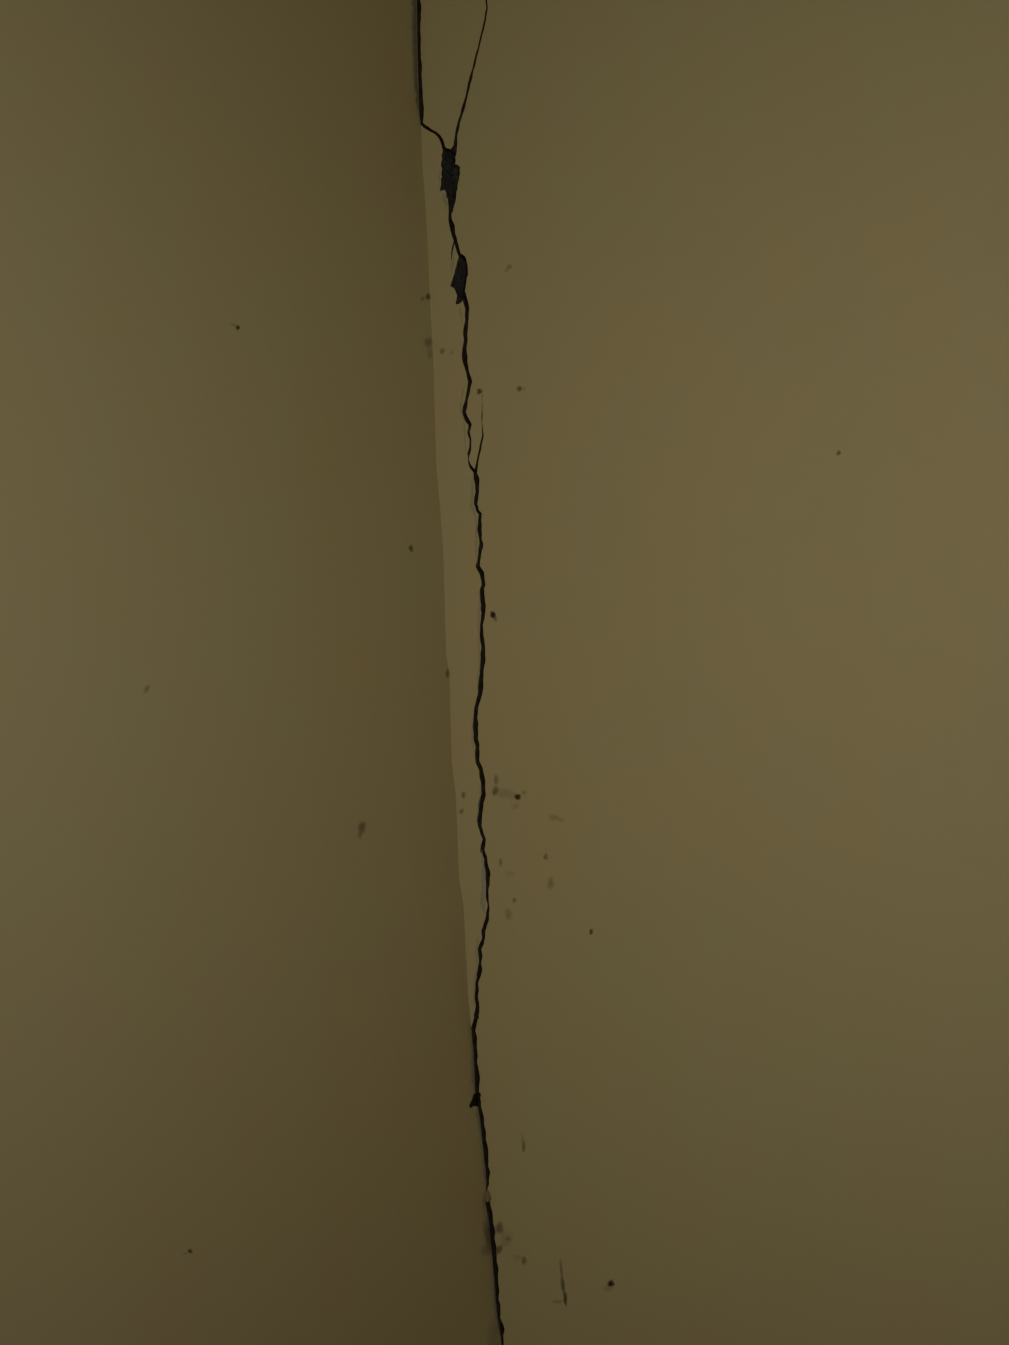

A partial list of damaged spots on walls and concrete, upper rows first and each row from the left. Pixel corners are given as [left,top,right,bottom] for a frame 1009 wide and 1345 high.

crack [414,0,488,155]
crack [445,198,467,265]
crack [462,301,505,1345]